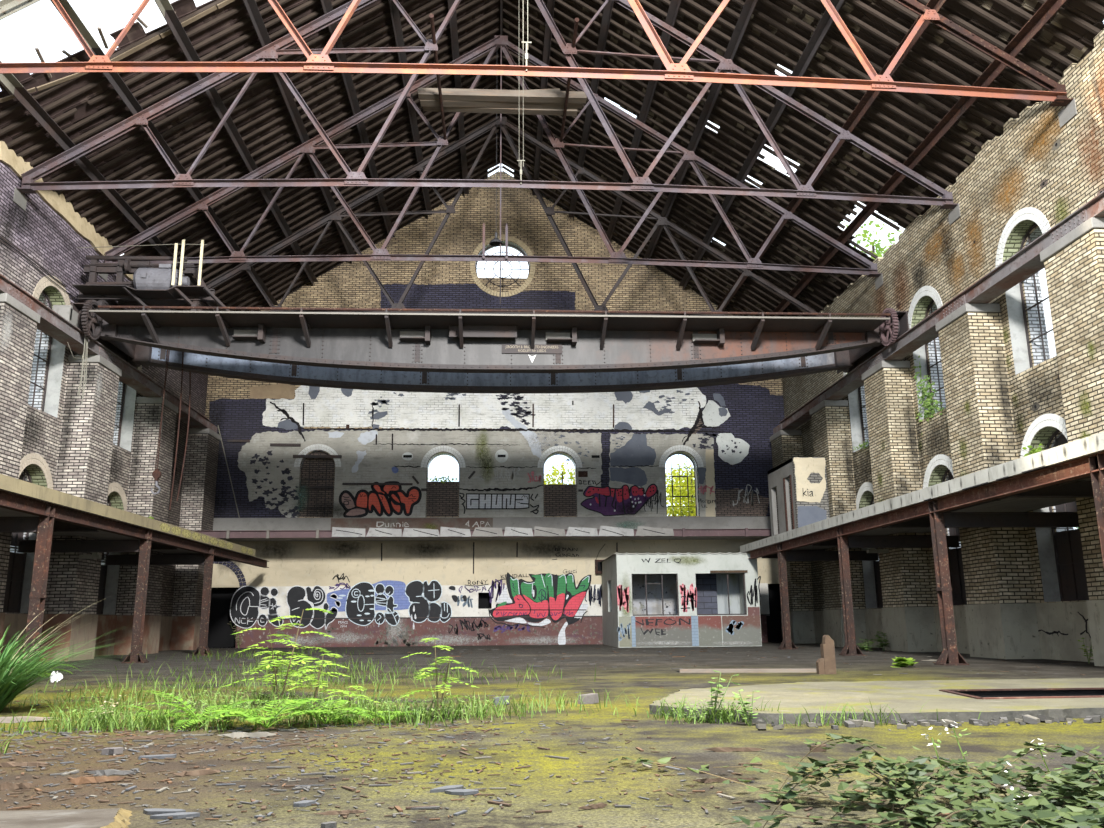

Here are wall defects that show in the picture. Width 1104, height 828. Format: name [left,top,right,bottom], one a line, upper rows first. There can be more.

leakage [1029,114,1056,154]
peeling [277,419,298,430]
peeling [308,386,320,399]
peeling [368,392,404,429]
crack [270,401,731,491]
peeling [496,393,589,464]
peeling [615,390,693,416]
peeling [693,419,741,454]
crack [1038,612,1091,638]